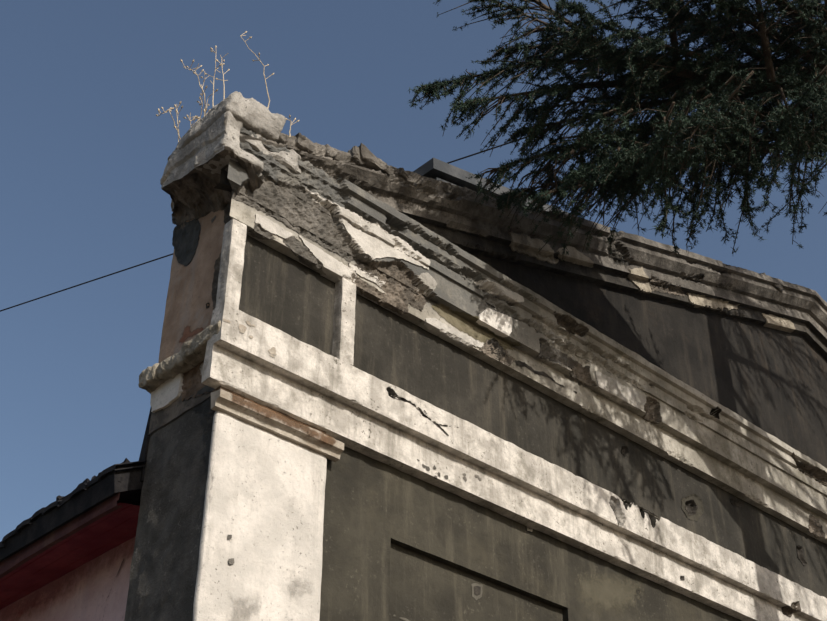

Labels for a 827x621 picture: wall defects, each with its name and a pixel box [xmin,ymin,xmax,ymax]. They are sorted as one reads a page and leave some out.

spalling [162,149,264,266]
flaking render [211,253,221,310]
spalling [554,311,589,337]
crack [387,387,459,444]
spalling [790,452,827,486]
spalling [610,496,661,528]